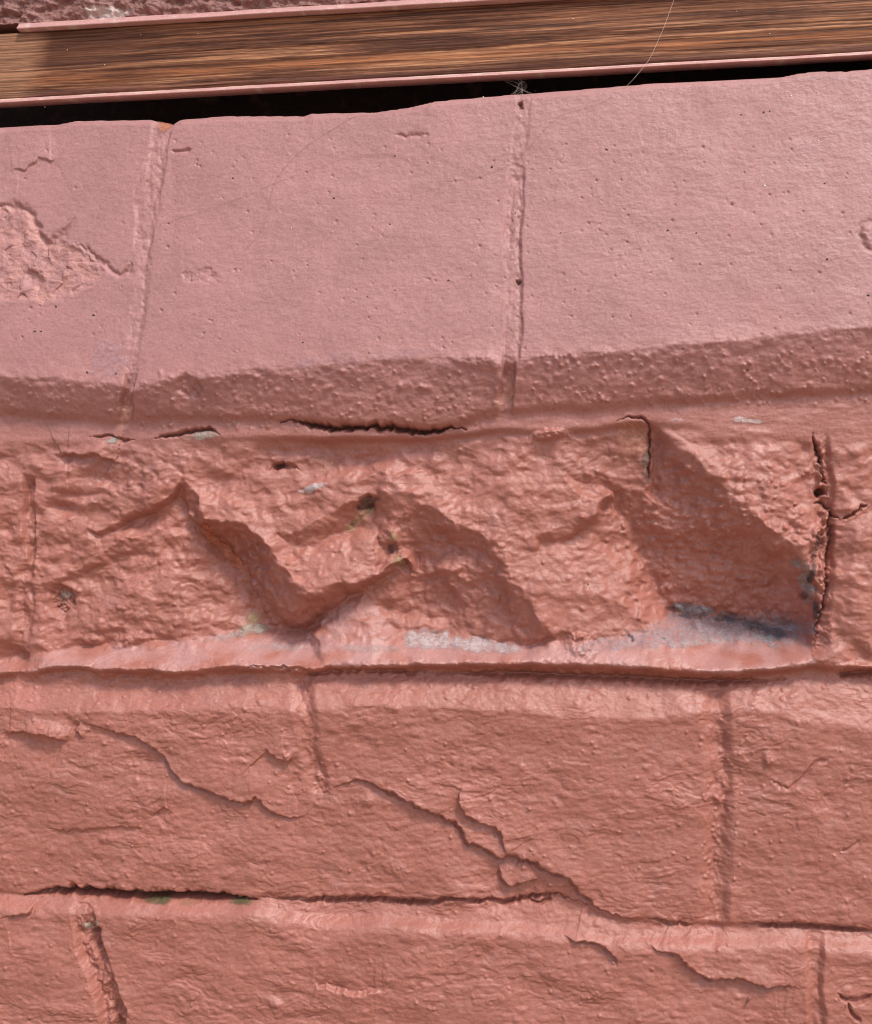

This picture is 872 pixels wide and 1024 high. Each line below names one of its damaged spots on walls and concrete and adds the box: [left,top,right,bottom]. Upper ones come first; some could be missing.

peeling [0,198,137,307]
crack [54,425,223,467]
crack [277,416,469,438]
crack [614,413,654,491]
crack [809,430,872,652]
damp [612,561,819,649]
crack [764,754,836,794]
crack [0,716,807,992]
crack [739,920,872,935]
crack [309,979,389,1000]